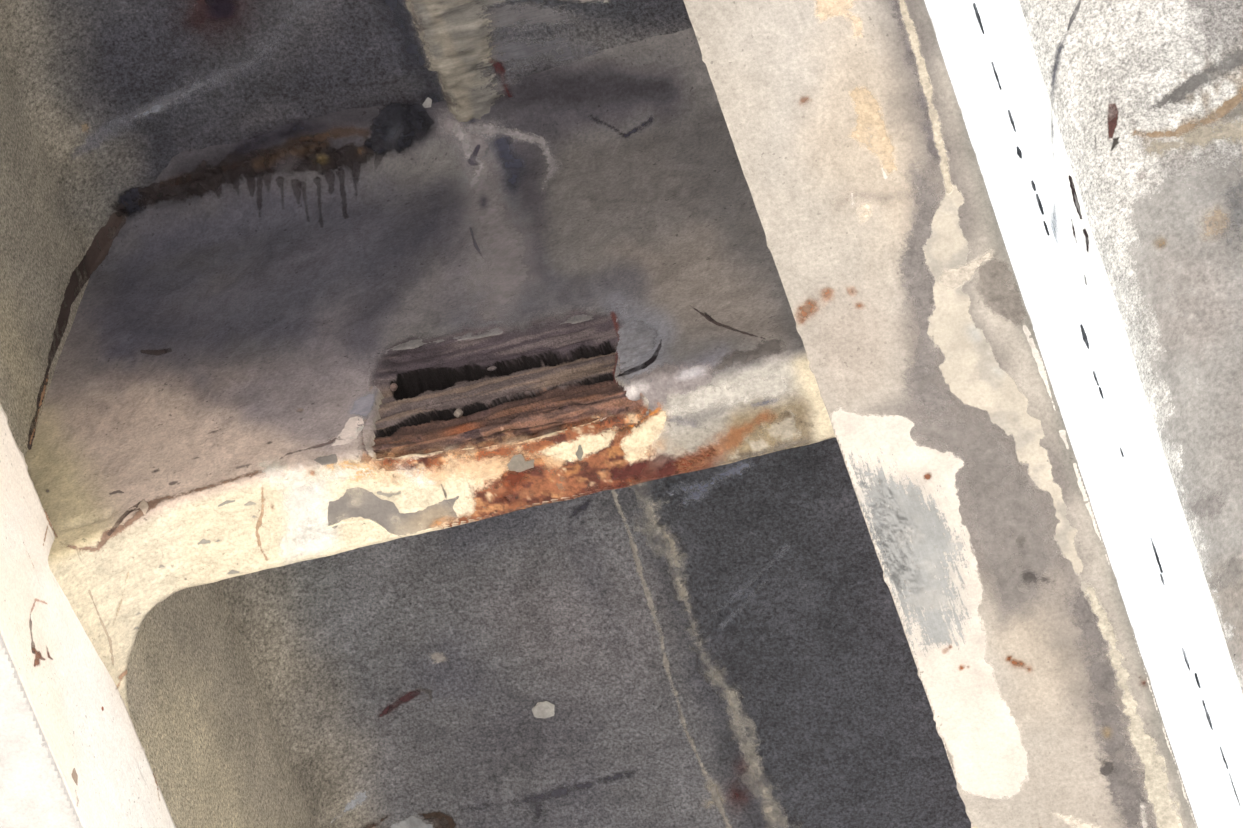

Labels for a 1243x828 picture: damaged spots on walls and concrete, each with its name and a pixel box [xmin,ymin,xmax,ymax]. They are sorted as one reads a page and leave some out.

water stain [27,0,608,450]
crack [141,348,172,356]
spalling [315,303,666,472]
peeling [327,484,459,536]
corrosion [327,400,813,529]